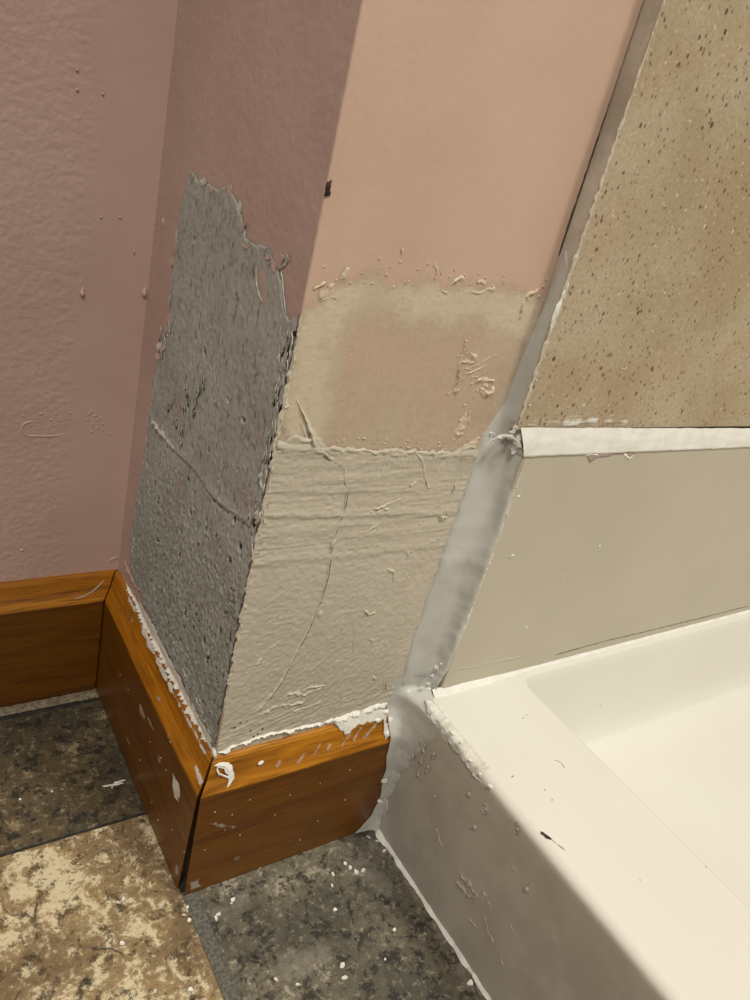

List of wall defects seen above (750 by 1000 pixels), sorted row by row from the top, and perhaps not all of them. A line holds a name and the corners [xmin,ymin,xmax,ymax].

crack [150,418,246,524]
peeling [130,170,303,746]
crack [252,489,349,714]